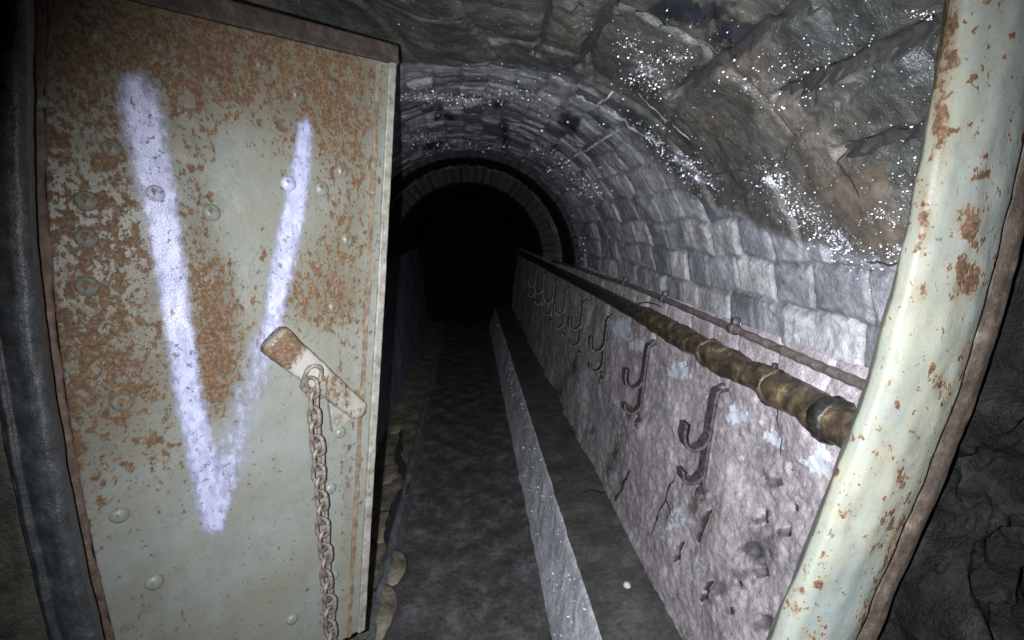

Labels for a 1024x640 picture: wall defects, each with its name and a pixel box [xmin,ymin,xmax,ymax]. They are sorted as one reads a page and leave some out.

water stain [650,0,759,46]
water stain [611,33,723,199]
water stain [745,157,909,291]
crack [650,477,675,539]